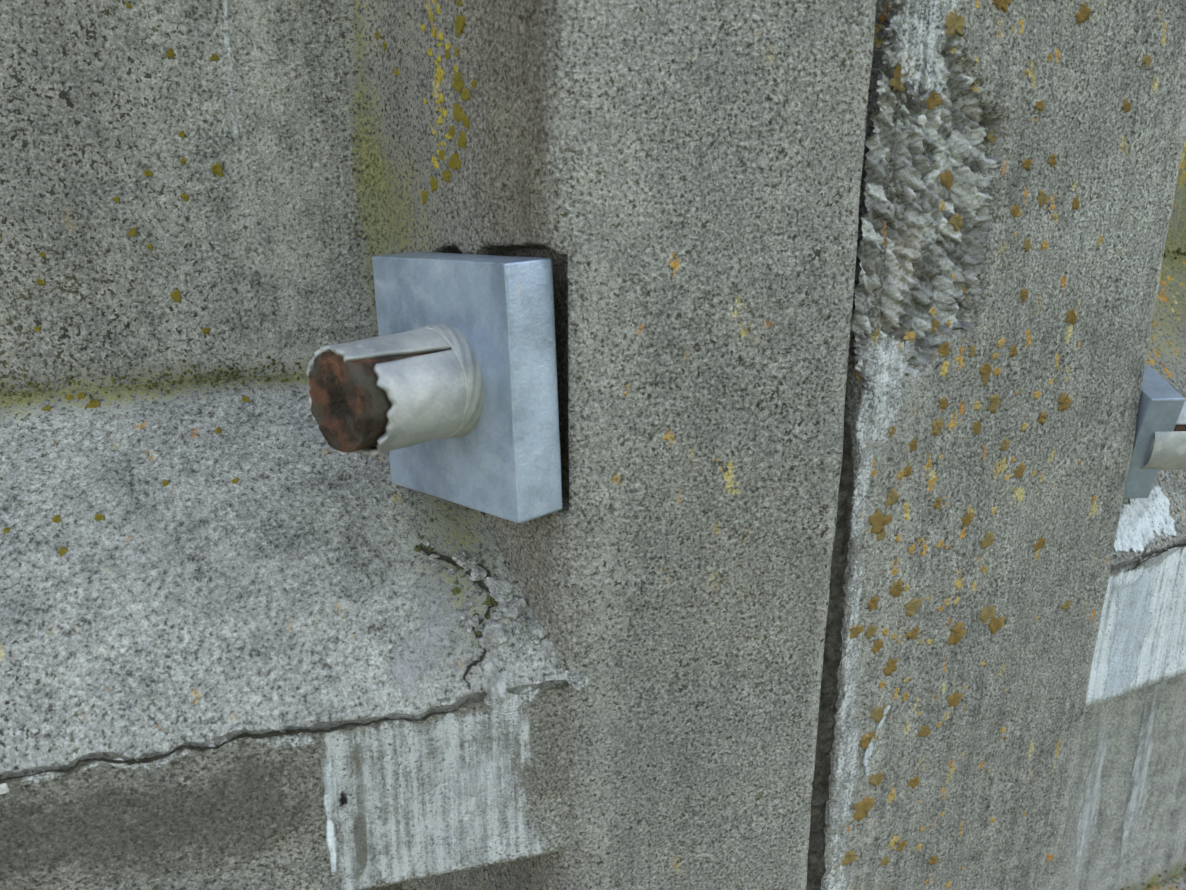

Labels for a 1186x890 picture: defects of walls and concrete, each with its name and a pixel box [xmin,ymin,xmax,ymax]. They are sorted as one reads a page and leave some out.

spalling [851,0,1005,414]
crack [0,535,592,794]